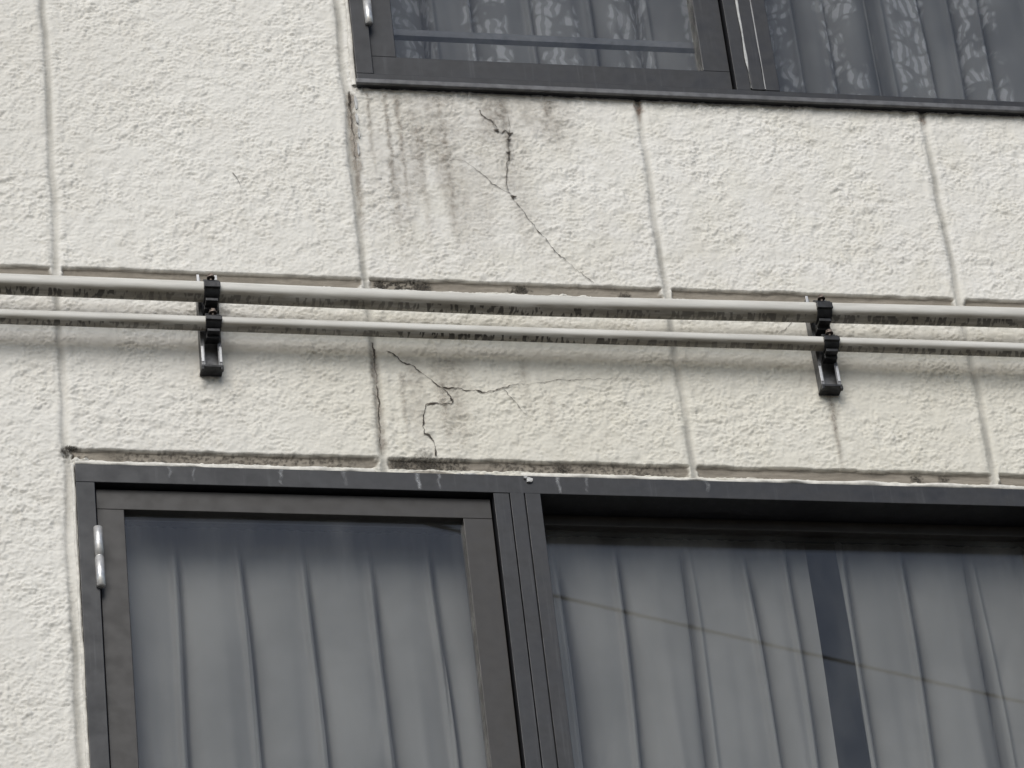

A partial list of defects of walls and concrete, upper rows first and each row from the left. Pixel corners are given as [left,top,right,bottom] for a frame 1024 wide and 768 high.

leakage [347,94,369,205]
crack [454,110,593,282]
crack [372,343,616,456]